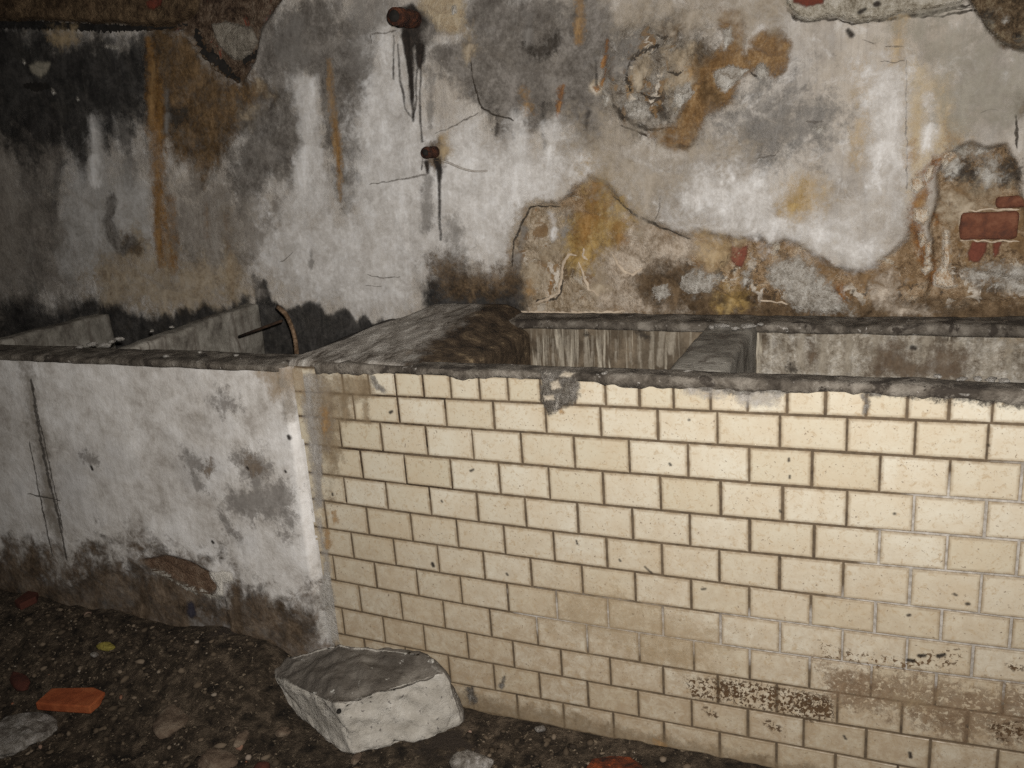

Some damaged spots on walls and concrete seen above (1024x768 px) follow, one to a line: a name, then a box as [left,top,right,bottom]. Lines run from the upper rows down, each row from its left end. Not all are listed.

corrosion [147,38,178,273]
water stain [0,0,881,317]
crack [451,58,514,127]
flaking render [652,10,791,151]
flaking render [507,142,1024,317]
peeling [544,372,573,400]
crack [28,377,67,560]
water stain [0,520,336,657]
spalling [145,555,233,599]